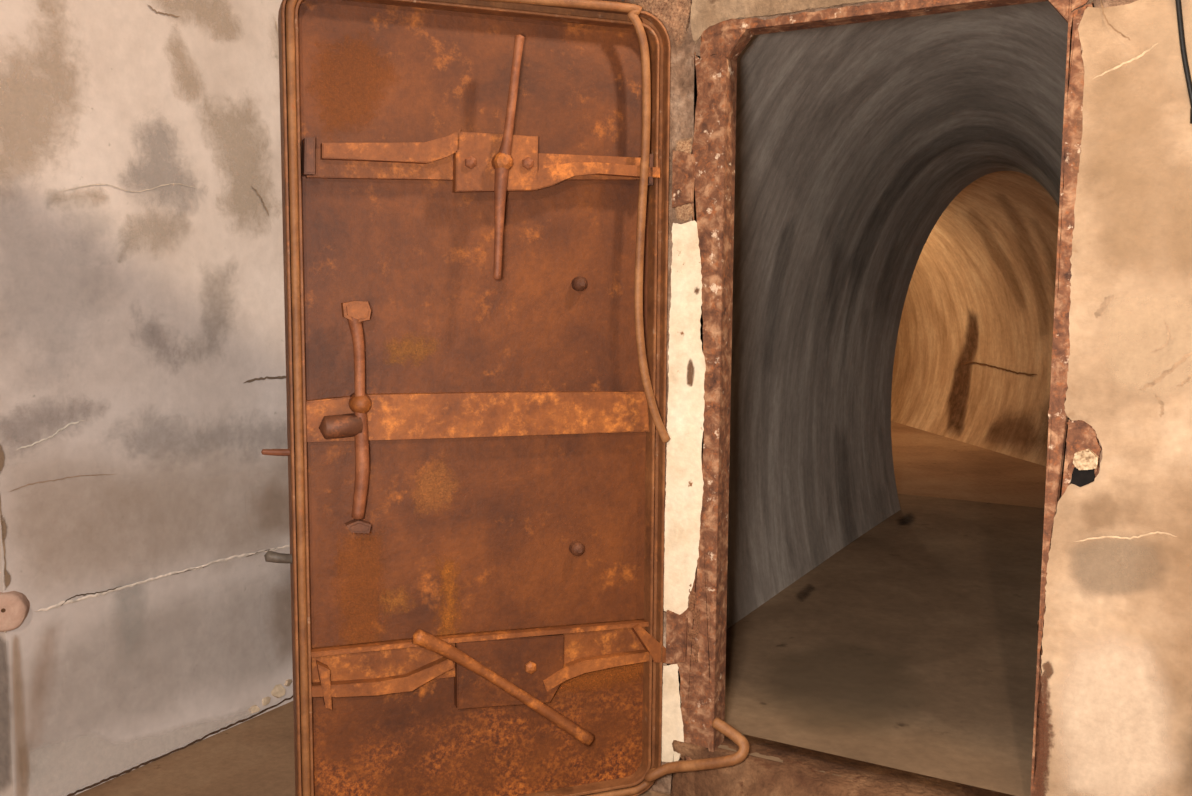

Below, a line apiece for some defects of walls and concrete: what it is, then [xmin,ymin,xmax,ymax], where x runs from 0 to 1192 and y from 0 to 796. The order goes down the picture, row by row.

crack [16,420,83,451]
crack [0,474,113,588]
crack [1073,531,1177,543]
crack [35,545,290,612]
spalling [687,583,703,663]
damp [0,642,9,784]
corrosion [559,662,643,690]
corrosion [1035,673,1053,796]